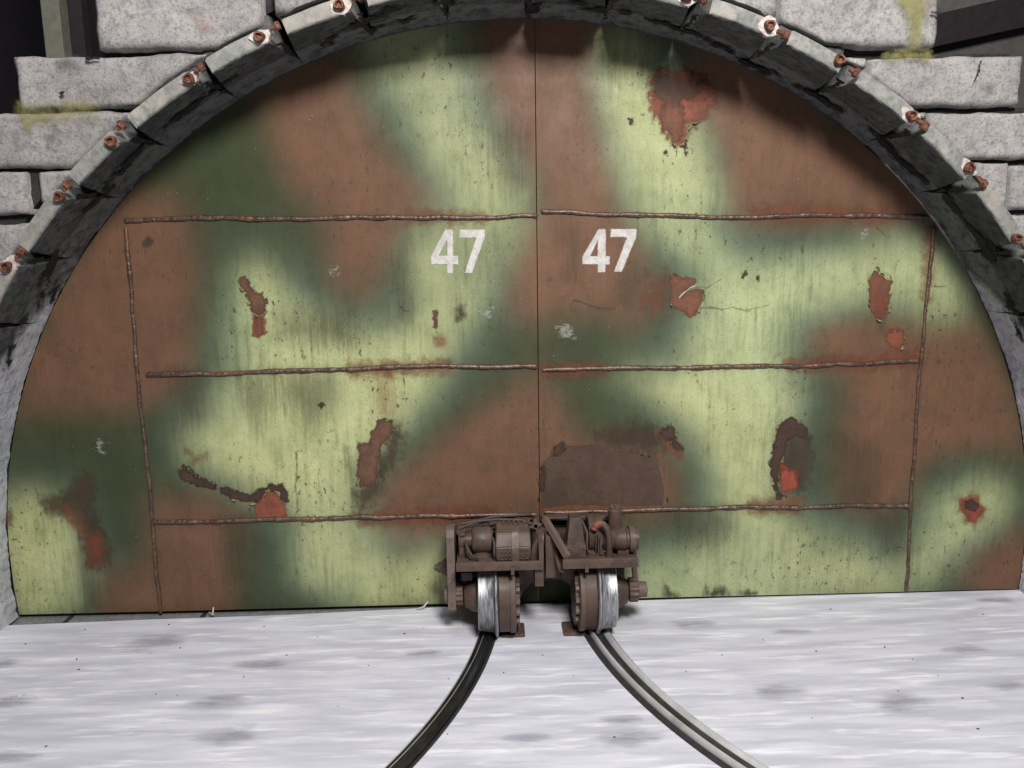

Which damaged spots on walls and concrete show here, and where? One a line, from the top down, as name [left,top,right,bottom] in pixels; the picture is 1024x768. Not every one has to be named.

rust [647,68,717,156]
rust [42,474,109,566]
rust [960,497,985,522]